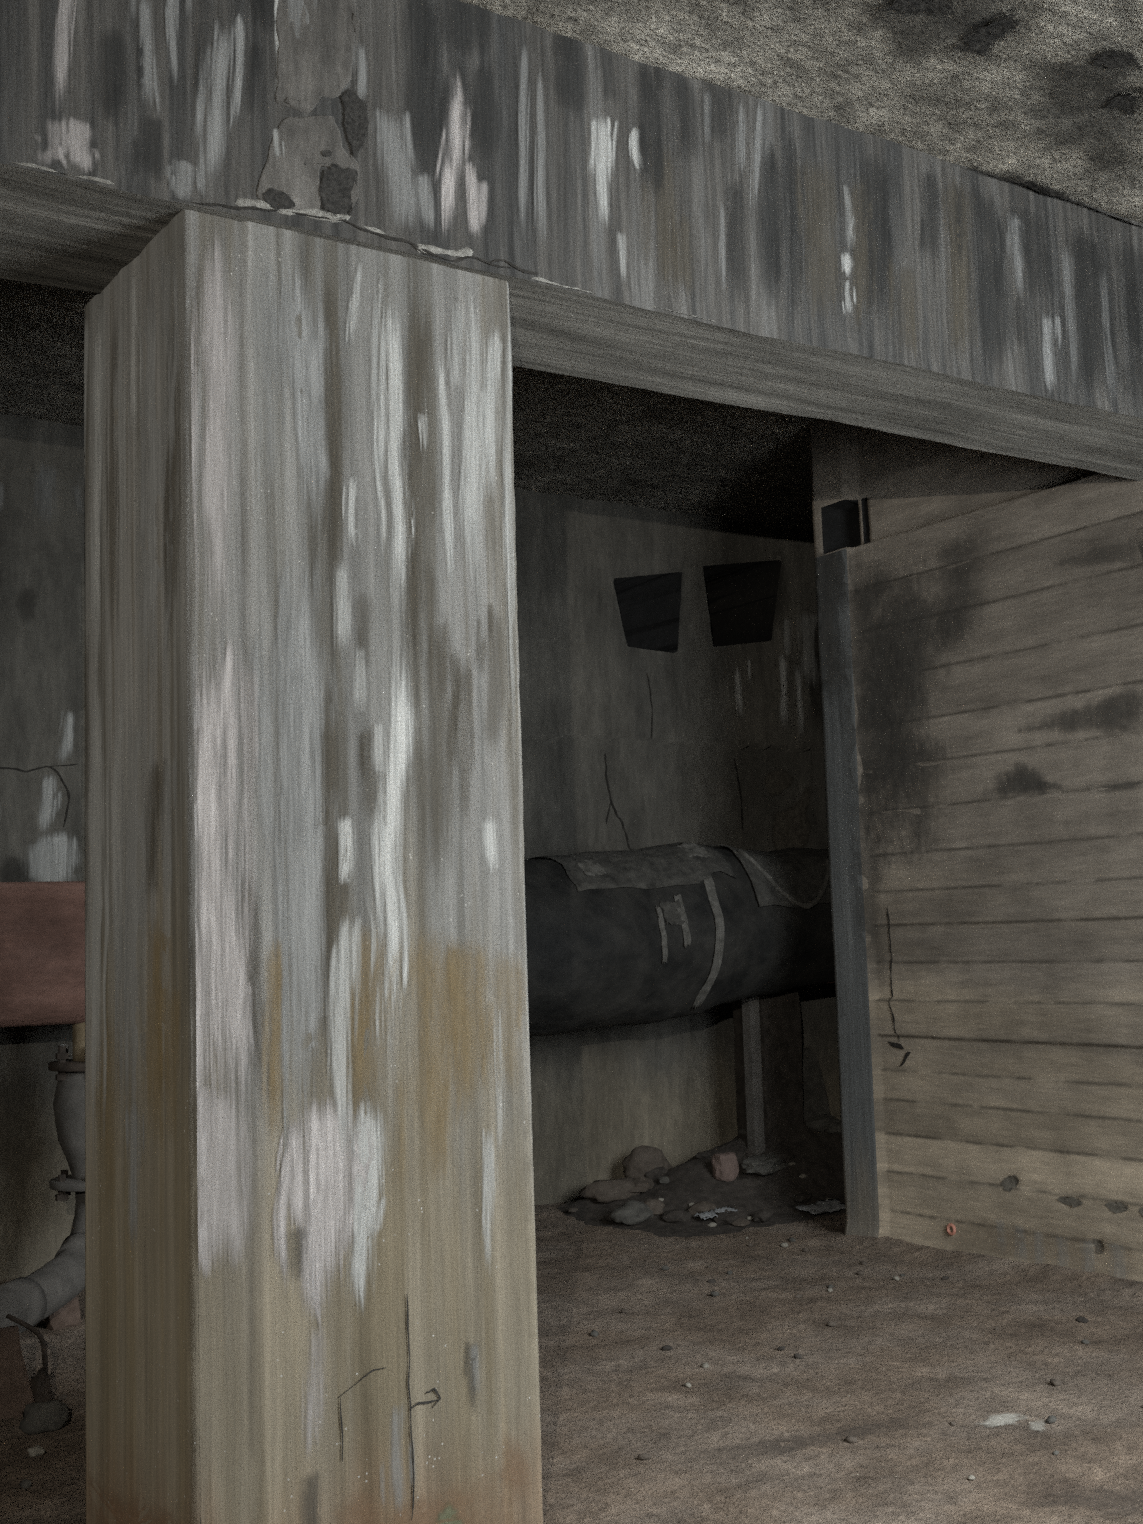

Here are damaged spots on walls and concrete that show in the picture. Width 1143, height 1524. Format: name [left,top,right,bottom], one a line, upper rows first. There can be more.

water stain [12,120,114,184]
water stain [56,0,76,88]
water stain [146,15,244,195]
peeling [256,0,368,218]
water stain [130,248,234,659]
water stain [279,269,360,635]
water stain [374,311,433,622]
water stain [439,321,499,567]
crack [0,764,77,826]
crack [605,753,632,850]
water stain [194,579,414,1322]
crack [887,907,911,1066]